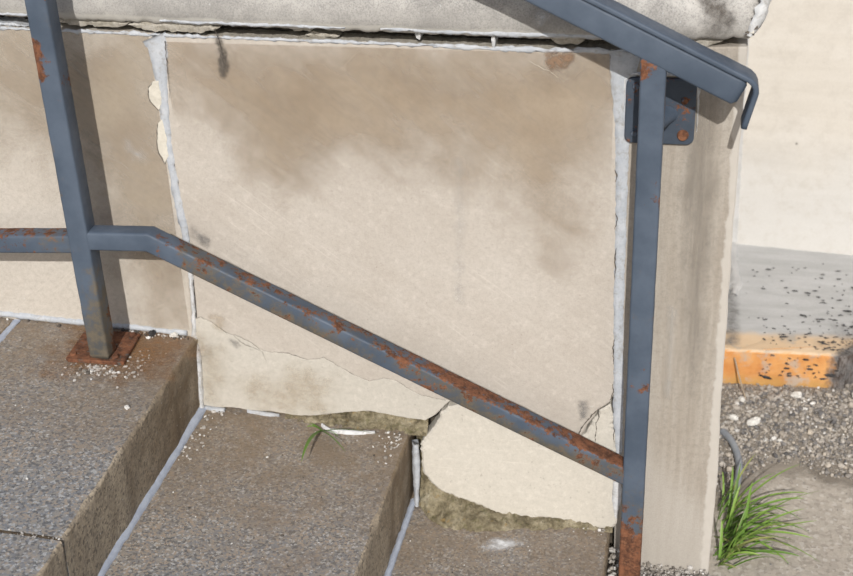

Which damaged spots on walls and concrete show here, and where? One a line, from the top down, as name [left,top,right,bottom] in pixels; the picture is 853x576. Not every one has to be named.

peeling [148,81,162,110]
peeling [156,120,169,164]
water stain [174,31,611,185]
crack [195,317,442,400]
crack [578,384,615,441]
spalling [285,411,613,533]